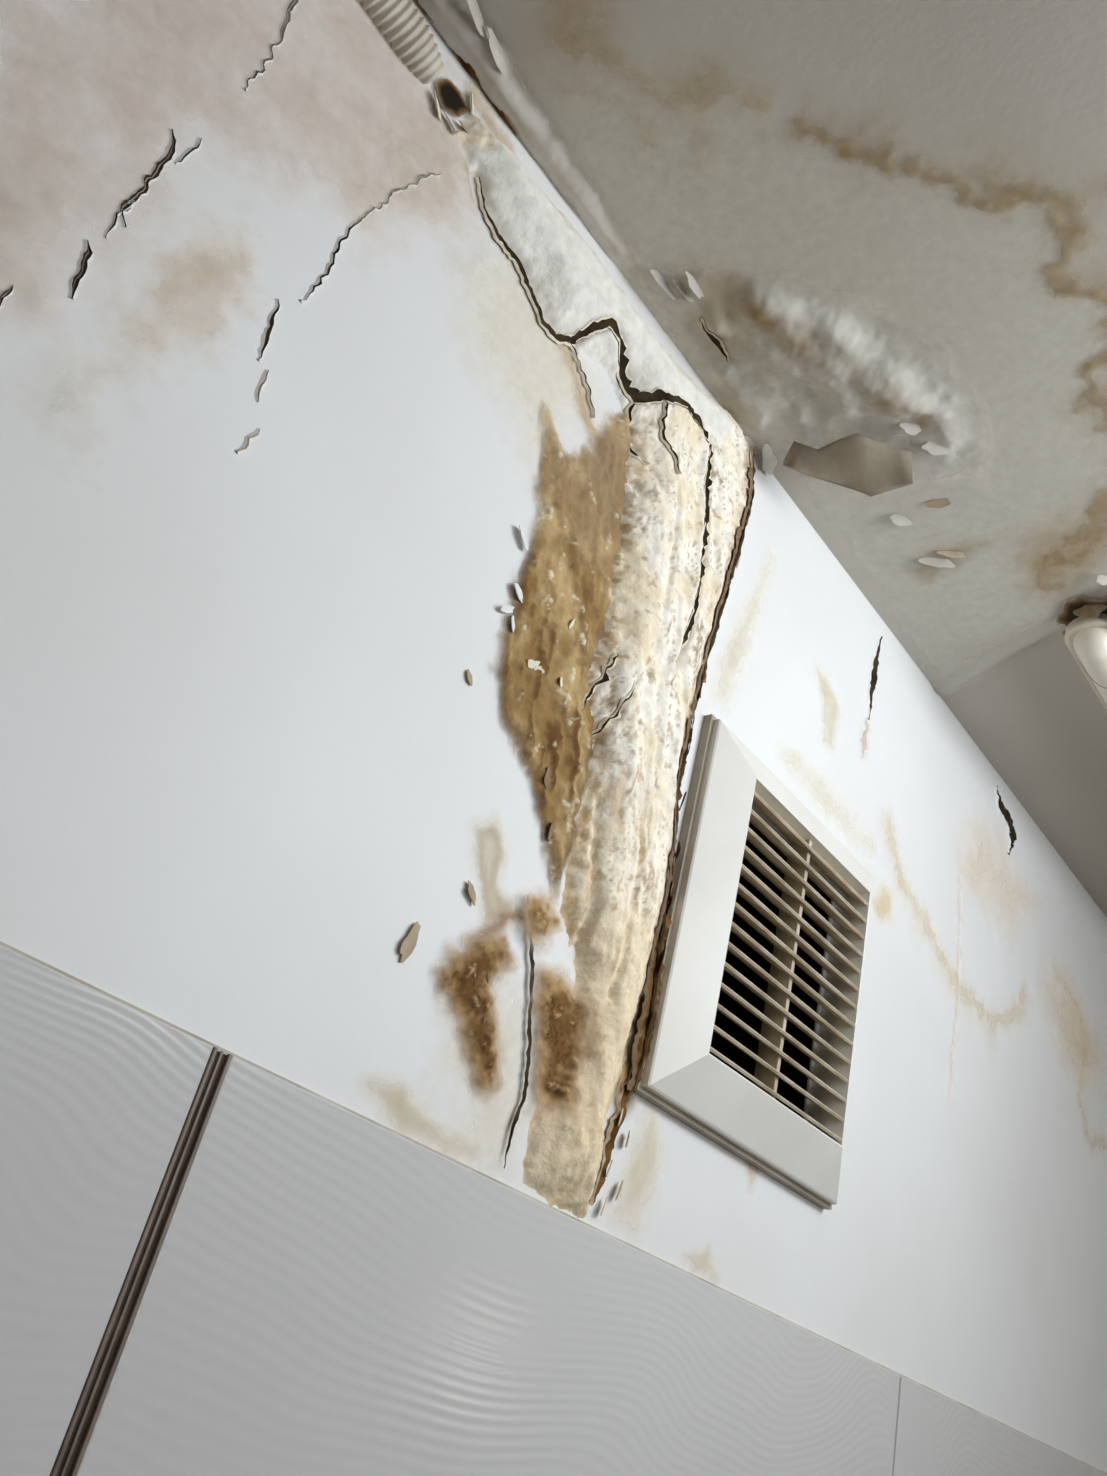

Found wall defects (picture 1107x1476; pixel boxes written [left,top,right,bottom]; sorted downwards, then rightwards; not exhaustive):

leakage [7,0,453,205]
crack [242,0,299,93]
crack [414,0,519,151]
crack [0,283,14,309]
crack [67,129,202,299]
leakage [794,119,1107,326]
leakage [1075,355,1107,432]
leakage [1035,491,1107,589]
crack [235,172,756,1216]
spalling [498,345,632,897]
crack [993,786,1017,856]